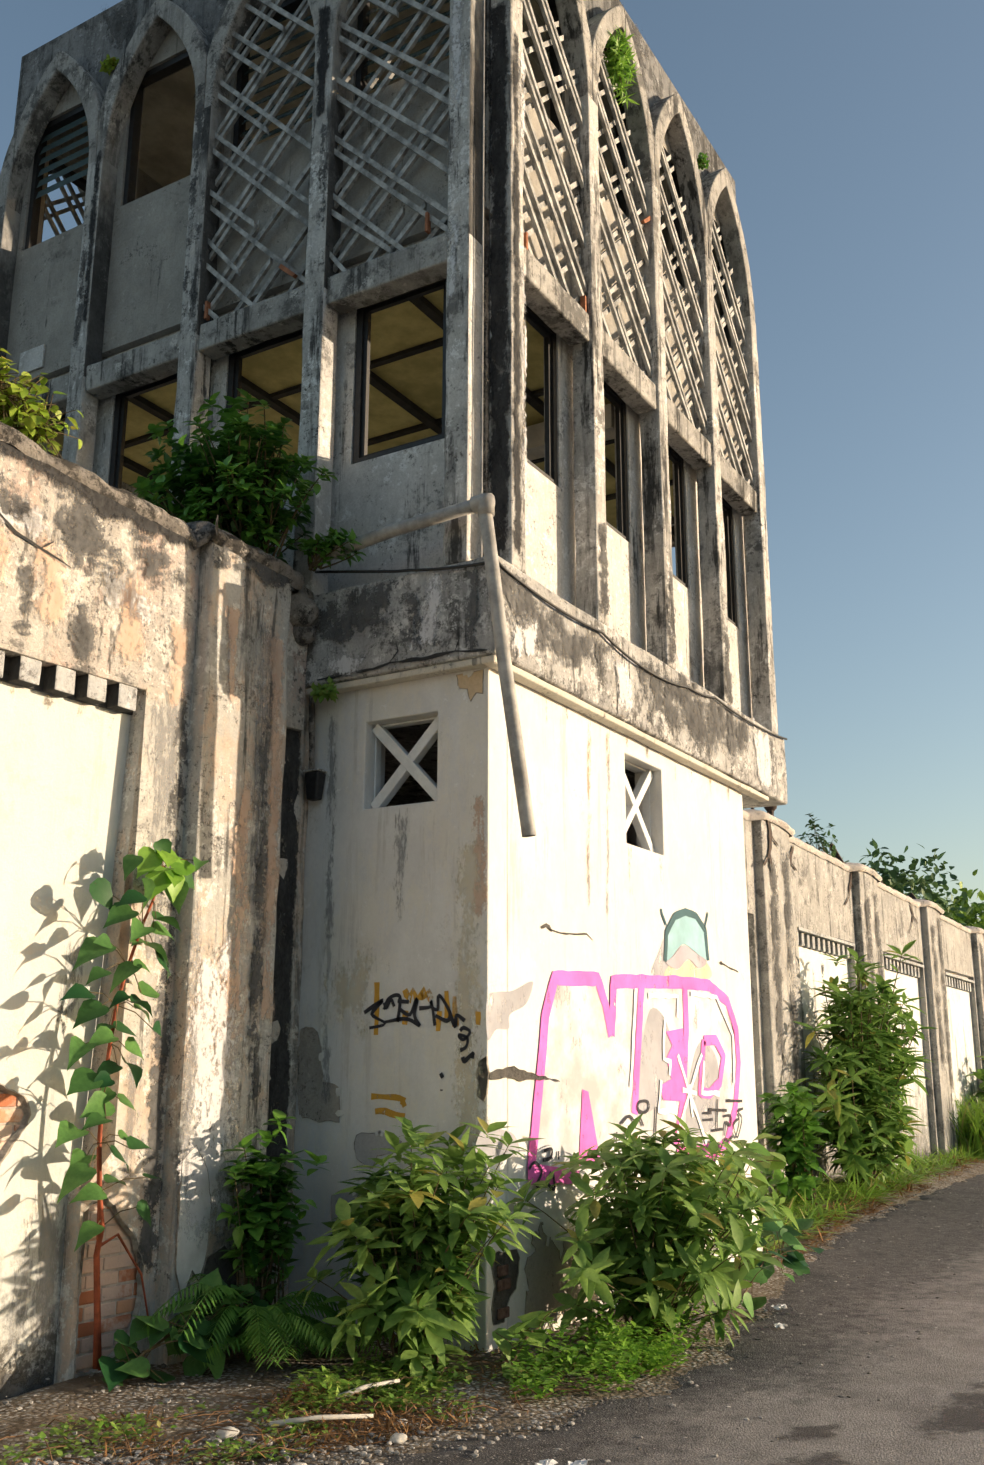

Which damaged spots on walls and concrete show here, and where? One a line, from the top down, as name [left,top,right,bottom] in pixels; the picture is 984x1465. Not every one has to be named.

leakage [451,0,463,109]
leakage [448,218,459,297]
leakage [463,0,776,790]
peeling [31,529,73,626]
leakage [0,440,195,663]
peeling [168,619,188,705]
leakage [212,544,294,592]
leakage [319,566,443,675]
flaking render [0,1083,31,1166]
peeling [296,1027,344,1123]
flaking render [74,1183,144,1378]
flaking render [491,1222,614,1330]